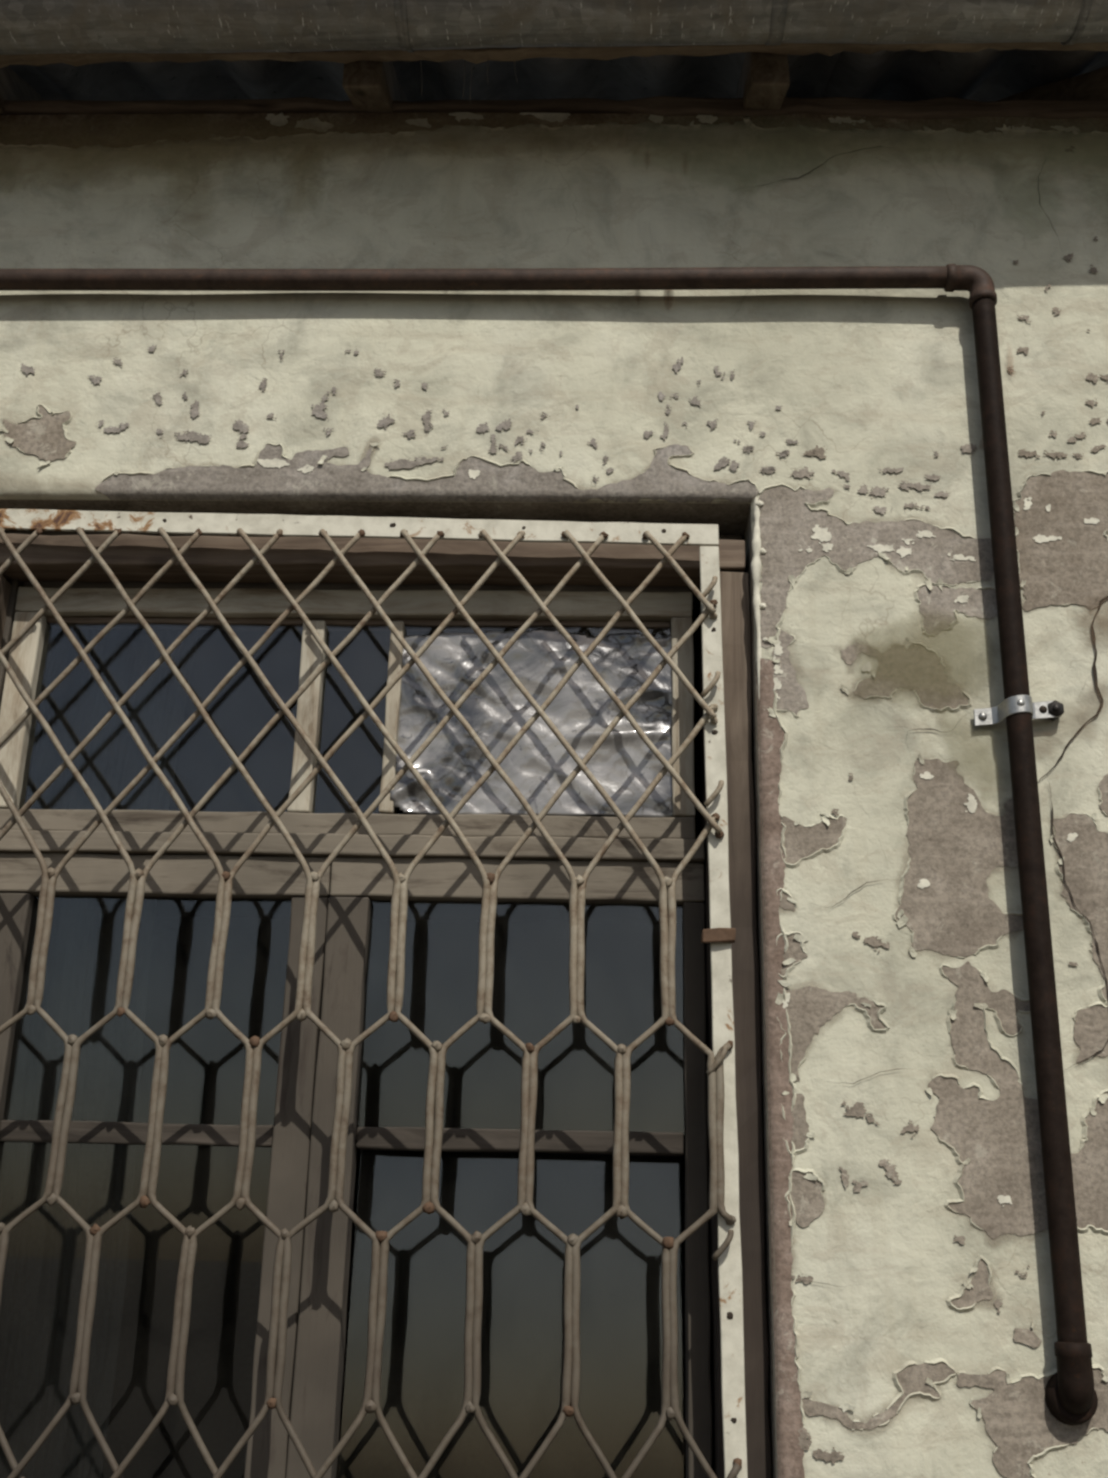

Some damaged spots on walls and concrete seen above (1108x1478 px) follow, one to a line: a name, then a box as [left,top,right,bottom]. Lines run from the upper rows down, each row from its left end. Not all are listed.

peeling [95,366,1108,1478]
crack [1038,596,1108,996]